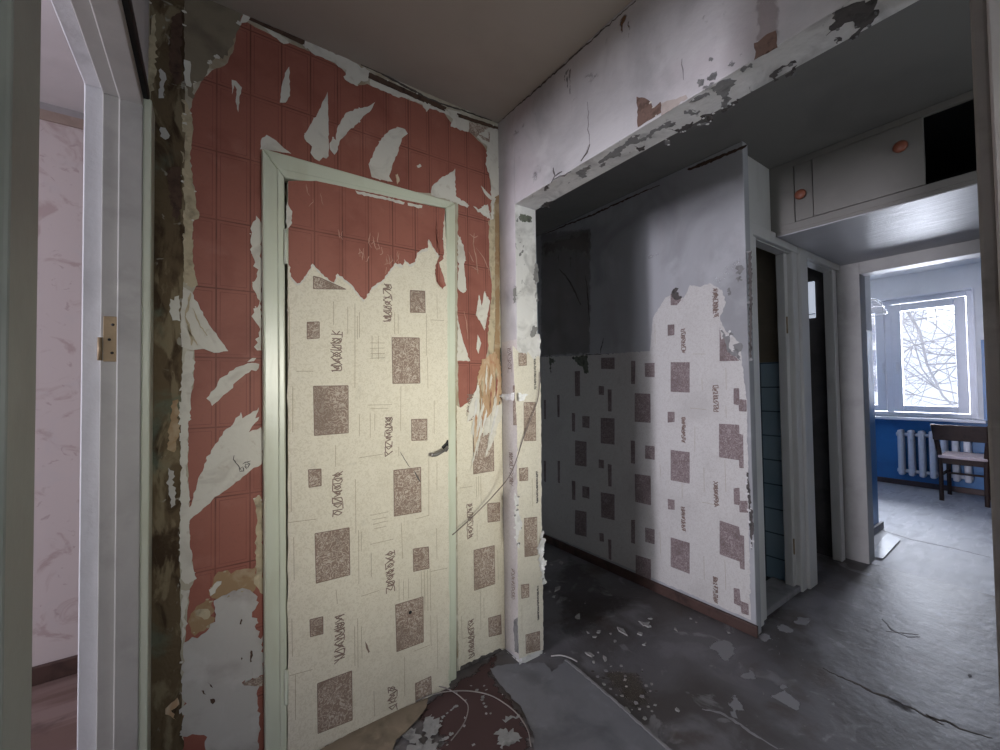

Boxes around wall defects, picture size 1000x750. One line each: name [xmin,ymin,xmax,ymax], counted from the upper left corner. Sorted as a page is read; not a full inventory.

flaking render [264,27,289,44]
flaking render [303,41,469,132]
flaking render [576,57,753,178]
flaking render [769,60,798,82]
flaking render [826,0,880,44]
flaking render [727,251,753,361]
flaking render [148,0,250,750]
crack [823,668,992,738]